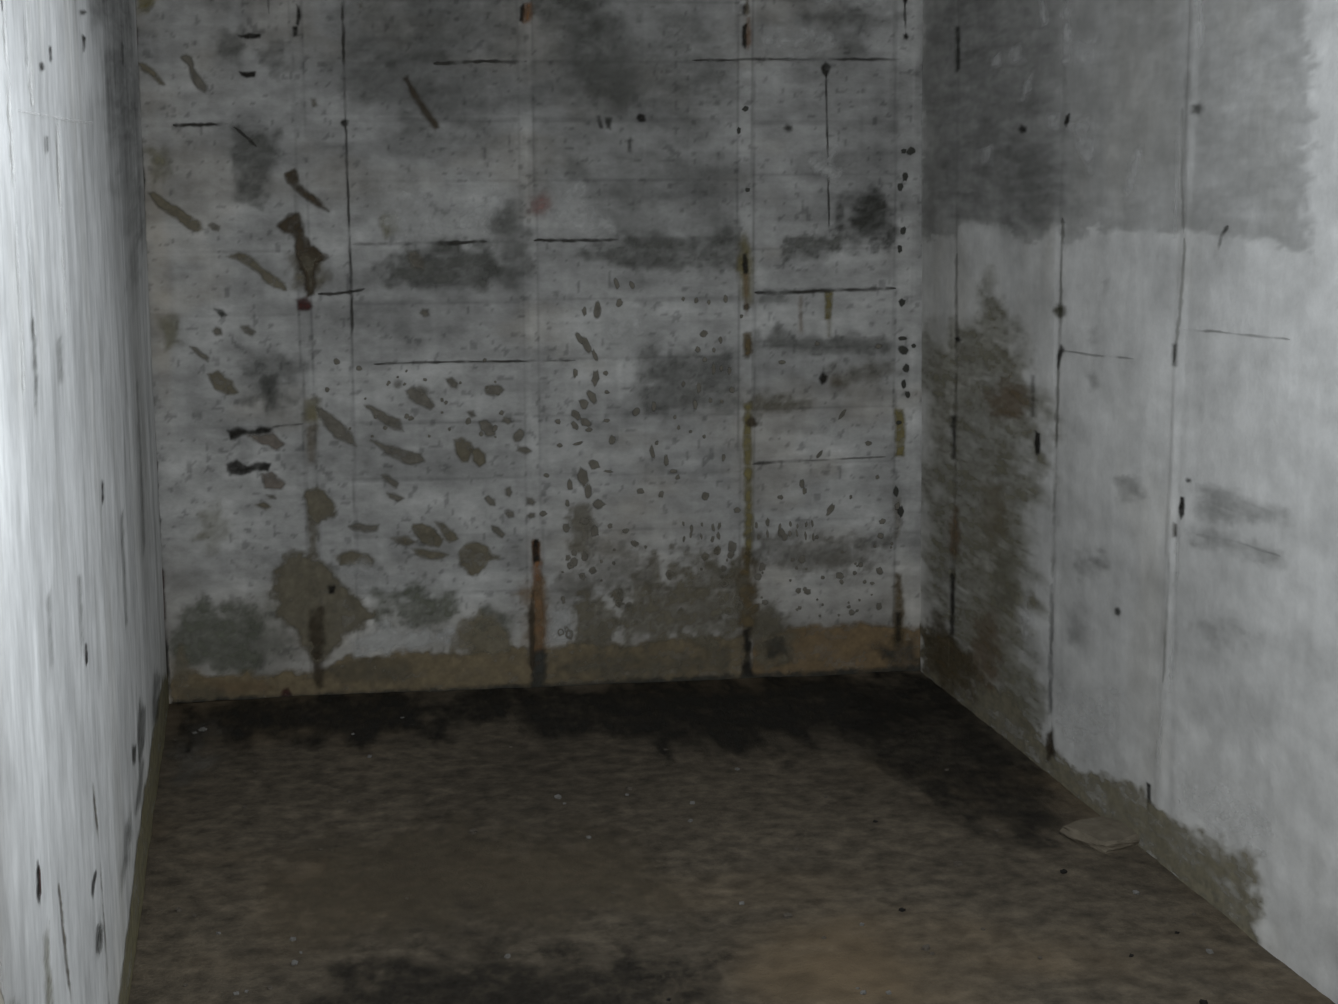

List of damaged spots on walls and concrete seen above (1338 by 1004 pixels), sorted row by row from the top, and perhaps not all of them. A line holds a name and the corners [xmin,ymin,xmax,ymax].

corrosion [520,540,548,688]
leakage [119,305,1262,1004]